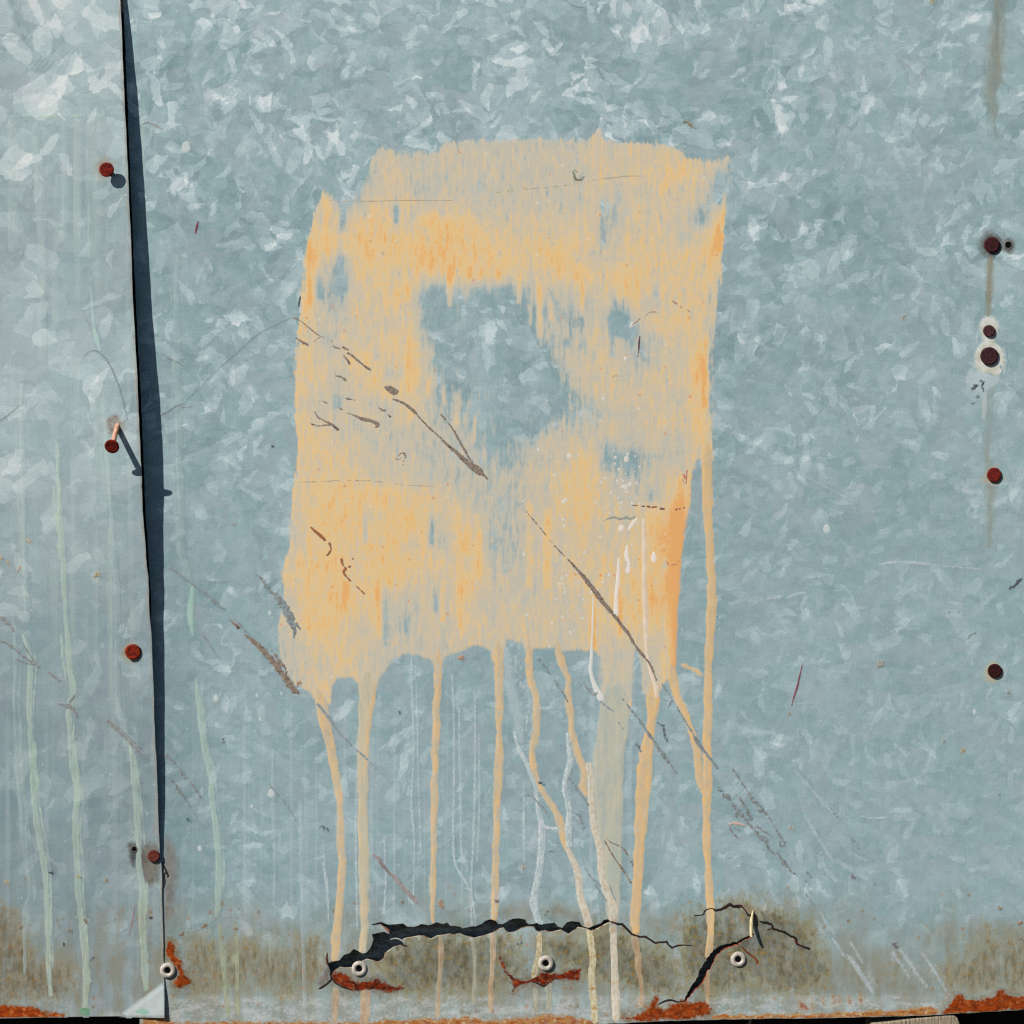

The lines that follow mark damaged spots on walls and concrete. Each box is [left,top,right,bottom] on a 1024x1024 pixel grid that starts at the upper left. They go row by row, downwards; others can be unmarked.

rust [0,1004,68,1017]
damp [0,888,94,1016]
rust [163,929,193,999]
damp [159,831,344,1011]
crack [318,902,814,1005]
rust [140,954,1024,1024]
damp [360,882,1024,1012]